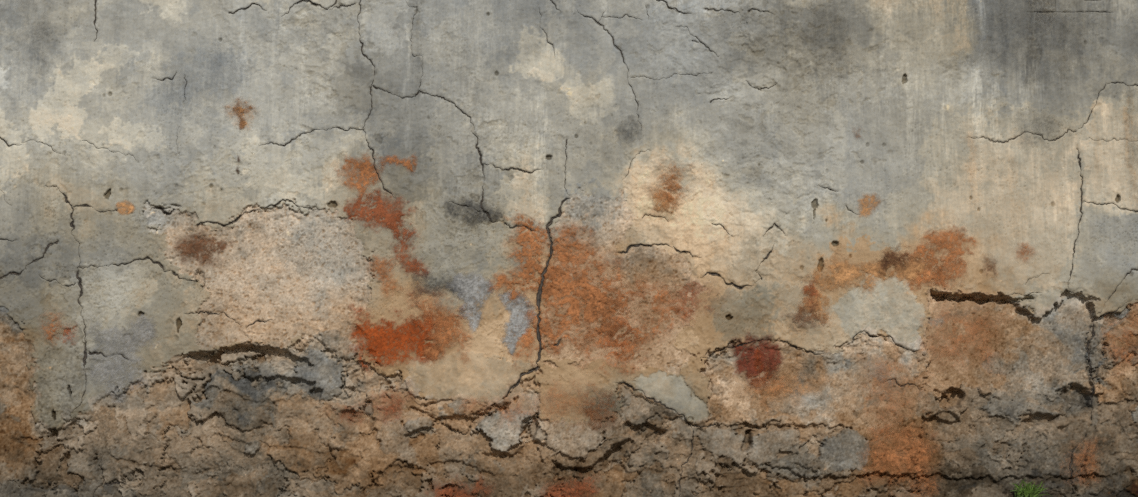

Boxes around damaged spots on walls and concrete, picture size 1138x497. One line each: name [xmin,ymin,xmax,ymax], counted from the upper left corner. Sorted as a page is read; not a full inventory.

crack [539,0,774,180]
spalling [0,307,127,486]
crack [0,185,193,409]
rust [342,156,428,291]
crack [229,0,569,397]
rust [352,291,470,367]
rust [490,215,697,372]
crack [619,214,786,289]
rust [734,336,808,408]
flaking render [405,0,1138,480]
rust [793,230,975,326]
crack [971,82,1138,296]